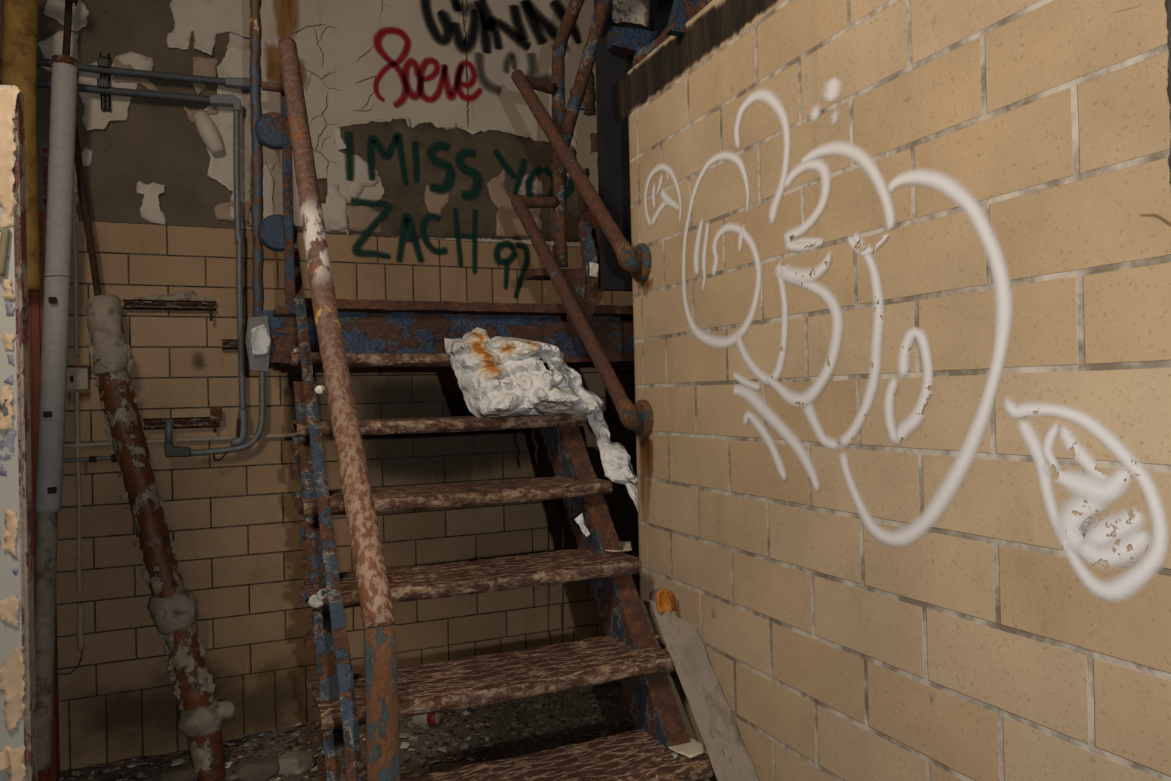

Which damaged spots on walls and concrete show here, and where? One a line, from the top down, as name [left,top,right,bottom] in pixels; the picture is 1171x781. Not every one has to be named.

peeling [38,0,159,131]
peeling [167,0,252,226]
spalling [37,134,49,212]
peeling [73,147,92,224]
peeling [136,181,166,225]
peeling [317,117,599,293]
corrosion [640,438,652,491]